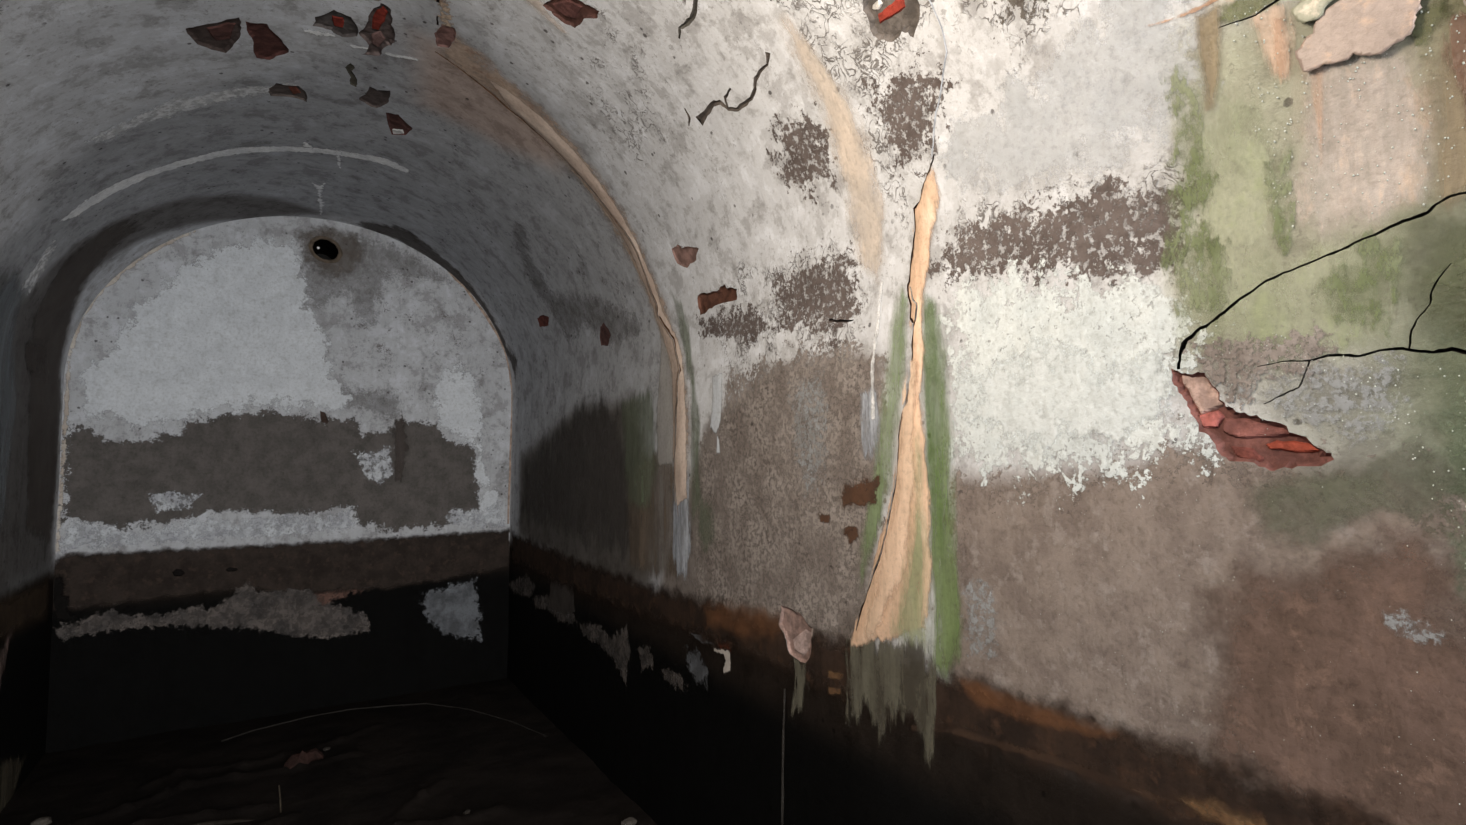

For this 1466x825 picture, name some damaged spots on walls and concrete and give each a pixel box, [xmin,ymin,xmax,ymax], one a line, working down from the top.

flaking render [186,18,289,60]
crack [678,0,698,38]
crack [684,52,770,126]
peeling [860,0,960,179]
peeling [1291,0,1423,72]
crack [907,0,947,362]
water stain [445,37,691,576]
crack [1177,192,1466,369]
crack [1258,264,1466,404]
peeling [55,582,370,642]
water stain [0,170,1466,825]
peeling [948,320,1466,789]